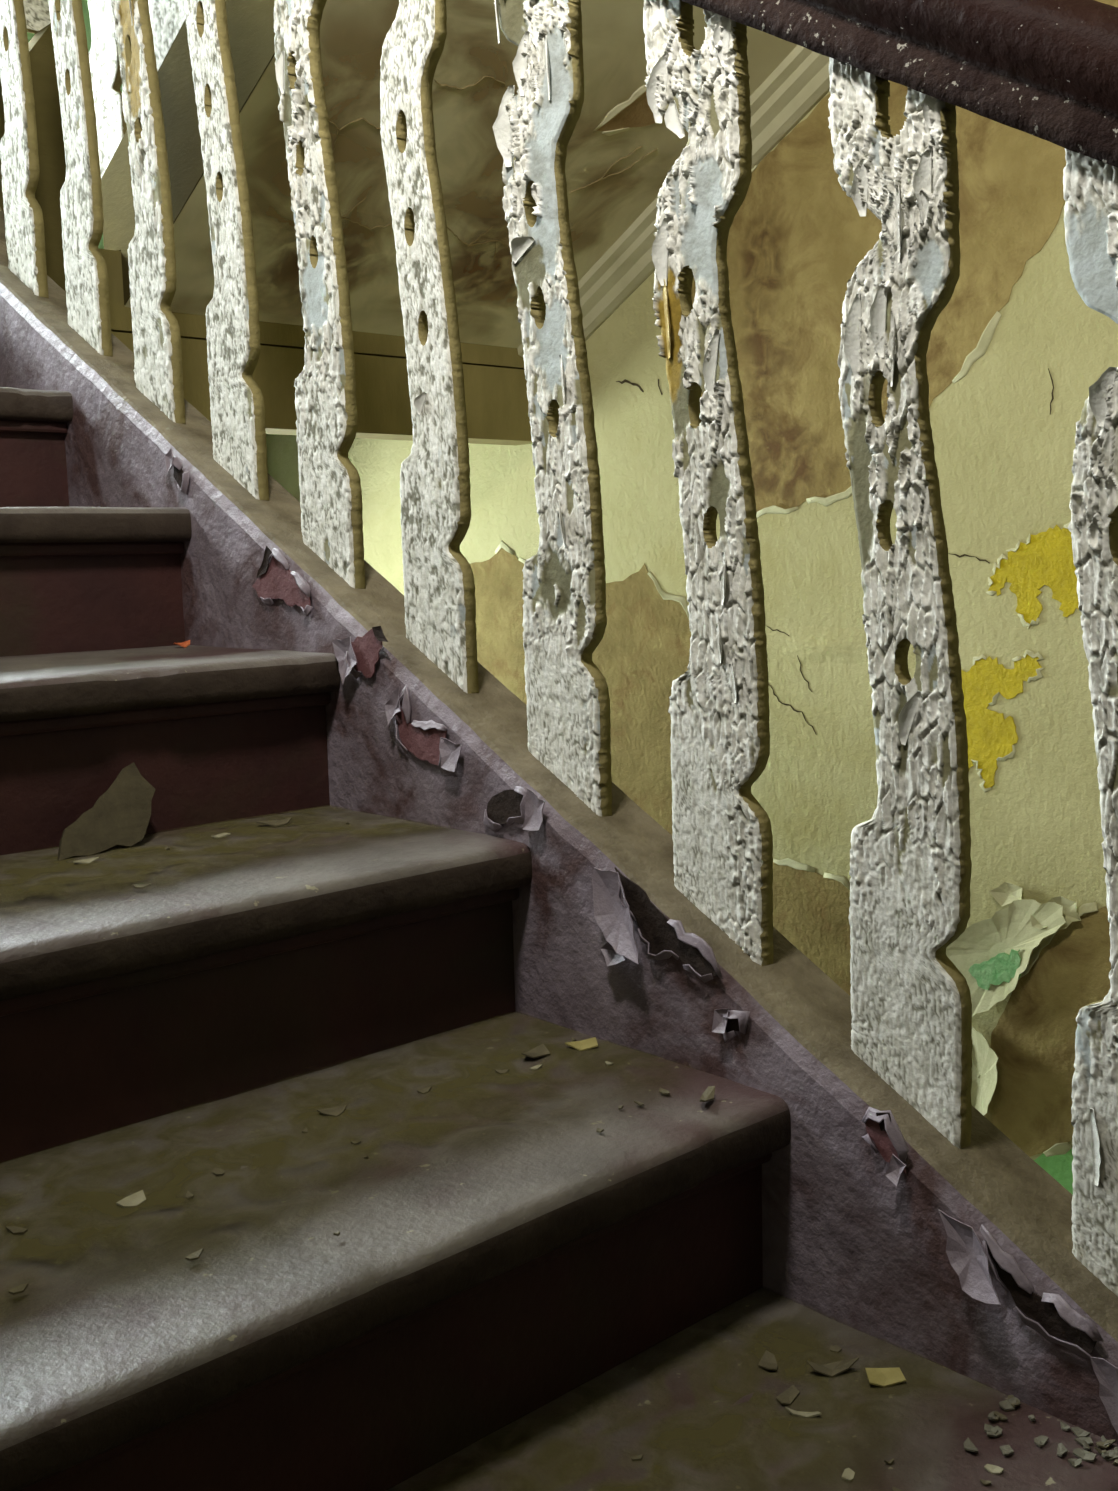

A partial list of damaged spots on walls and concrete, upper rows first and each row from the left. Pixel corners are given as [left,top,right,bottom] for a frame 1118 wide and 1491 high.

flaking render [700,80,939,518]
flaking render [926,106,1066,408]
damp [759,428,810,494]
peeling [332,626,388,685]
peeling [385,685,462,772]
flaking render [470,541,527,705]
peeling [483,786,545,832]
flaking render [592,563,691,835]
peeling [592,867,723,983]
flaking render [772,858,851,996]
peeling [946,882,1111,1186]
peeling [938,1209,1118,1434]